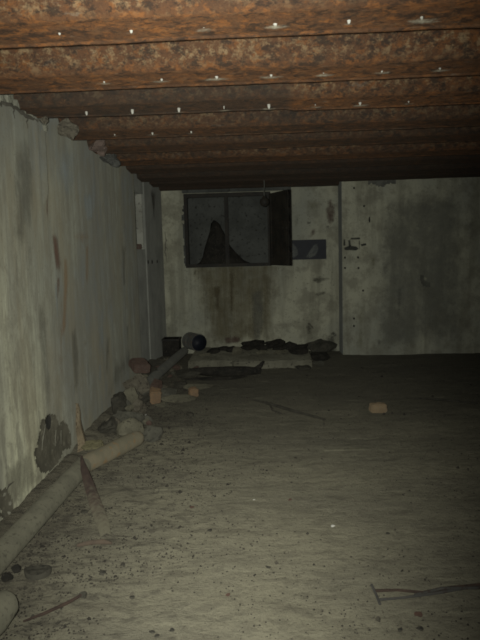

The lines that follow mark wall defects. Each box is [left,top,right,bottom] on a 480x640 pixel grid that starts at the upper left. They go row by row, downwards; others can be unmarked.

spalling [0,94,33,117]
peeling [34,414,73,474]